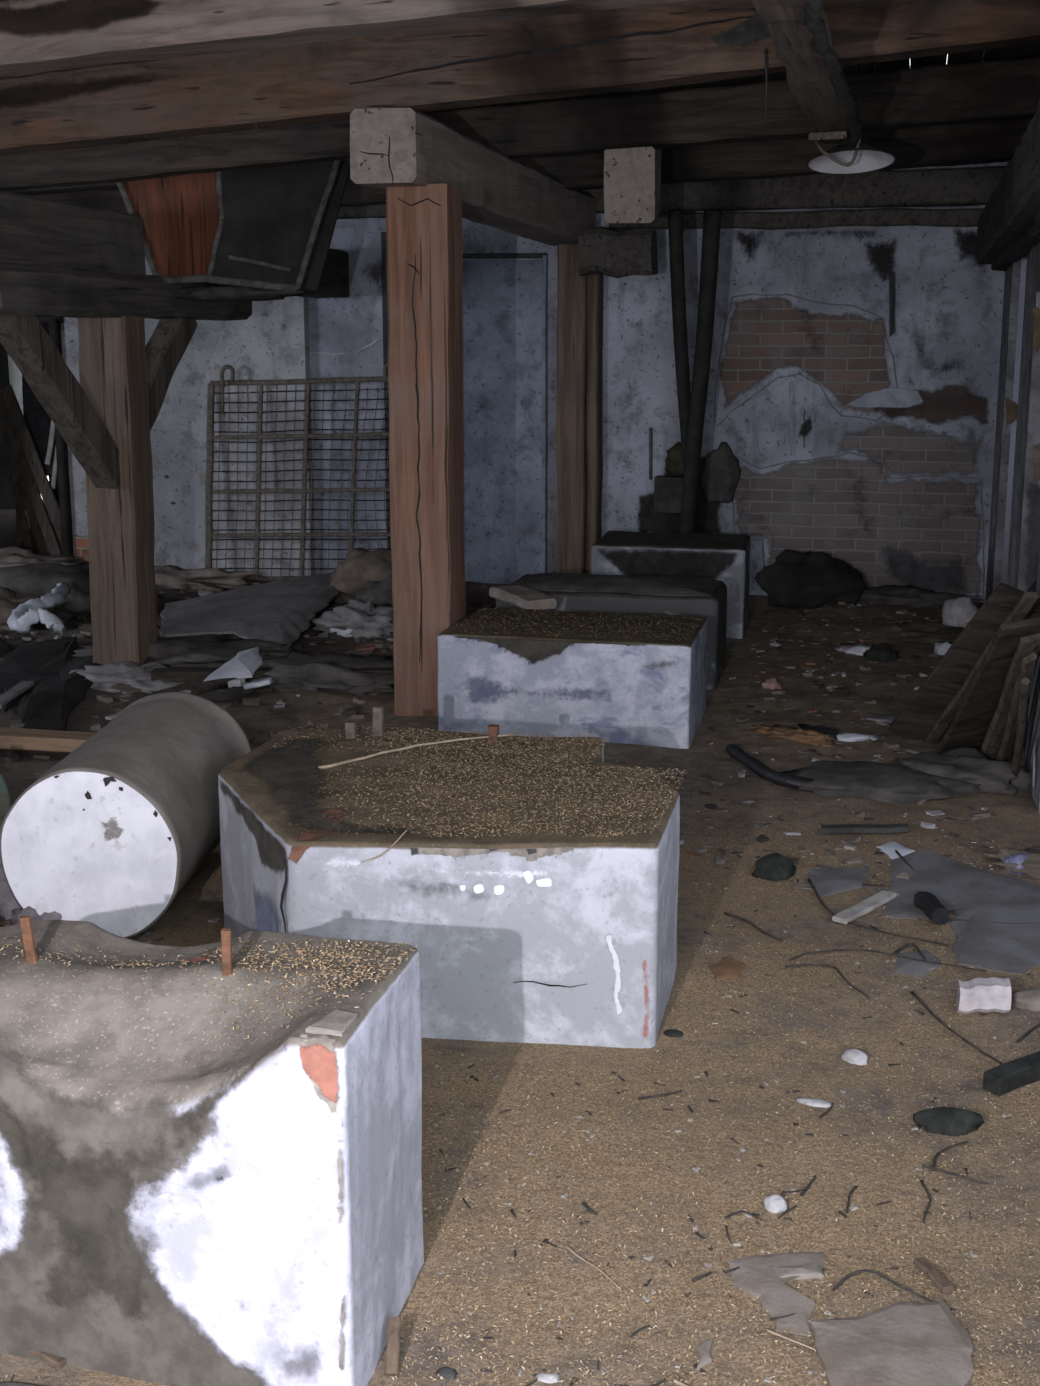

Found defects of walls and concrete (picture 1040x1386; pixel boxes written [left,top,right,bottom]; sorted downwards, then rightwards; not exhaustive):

damp [0,0,159,36]
crack [407,256,423,663]
flaking render [638,294,988,600]
spalling [300,1009,358,1115]
damp [0,1051,266,1386]
damp [285,1353,317,1376]